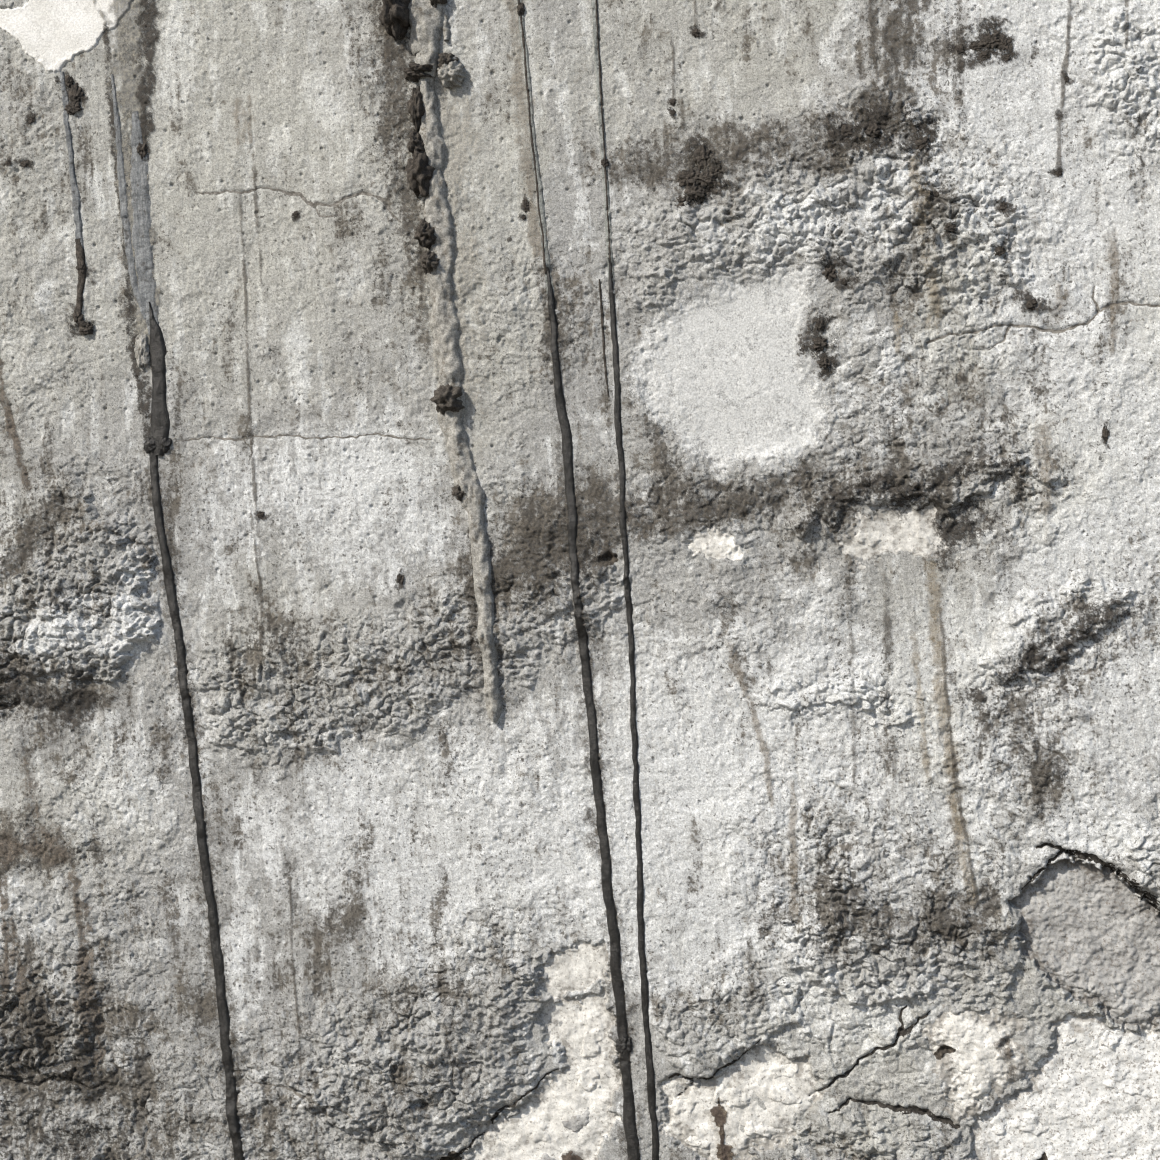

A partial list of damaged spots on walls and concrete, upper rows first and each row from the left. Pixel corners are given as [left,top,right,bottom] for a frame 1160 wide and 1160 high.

peeling [0,0,130,73]
mould [674,134,730,208]
leakage [1013,288,1050,318]
peeling [622,258,835,483]
mould [795,304,840,385]
mould [790,457,1032,571]
crack [1021,843,1160,913]
spalling [920,850,1160,1160]
spalling [471,940,622,1160]
crack [668,1039,761,1096]
crack [809,1005,960,1129]
rust [710,1097,736,1160]